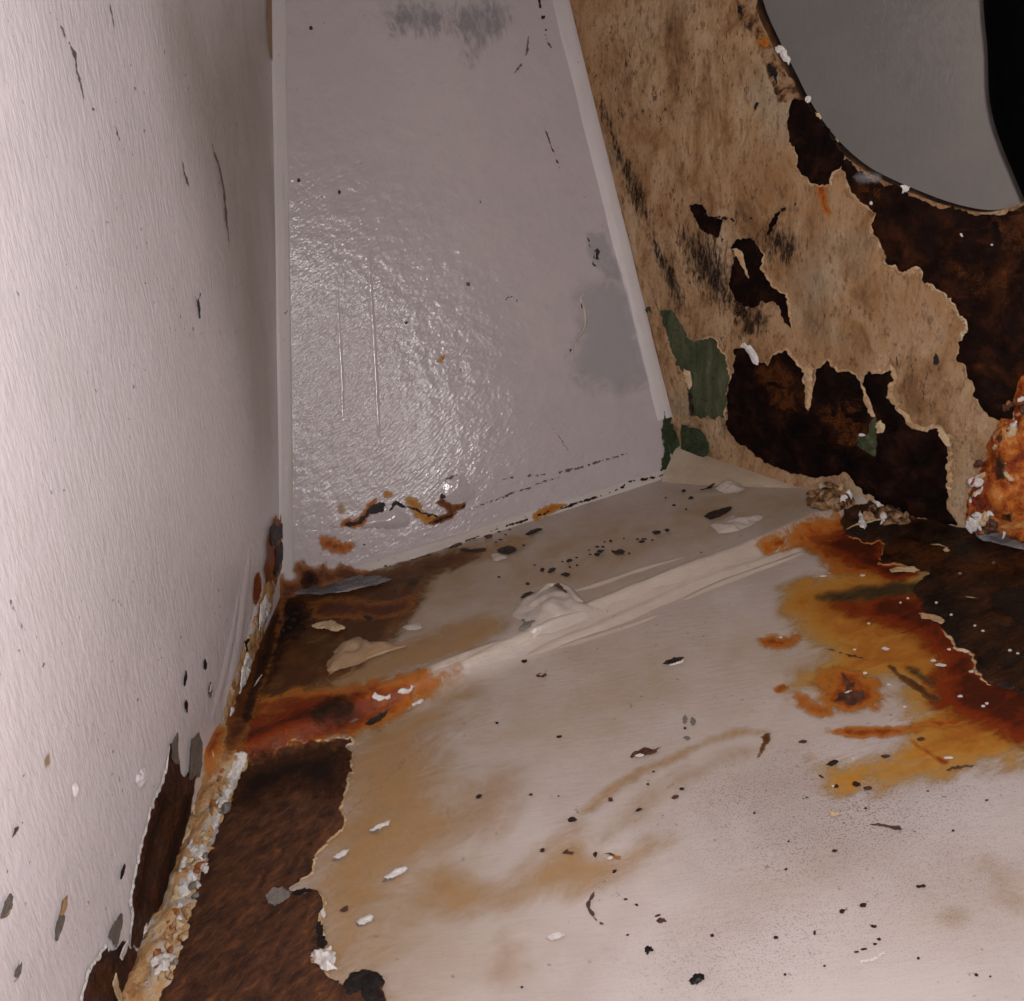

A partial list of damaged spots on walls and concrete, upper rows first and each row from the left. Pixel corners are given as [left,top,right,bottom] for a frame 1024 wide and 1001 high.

crack [50,12,95,111]
crack [212,144,229,242]
spalling [787,96,1024,450]
spalling [79,580,386,1001]
corrosion [224,516,527,987]
corrosion [587,749,688,810]
peeling [705,506,732,519]
spalling [726,238,1024,695]
corrosion [757,510,1024,796]